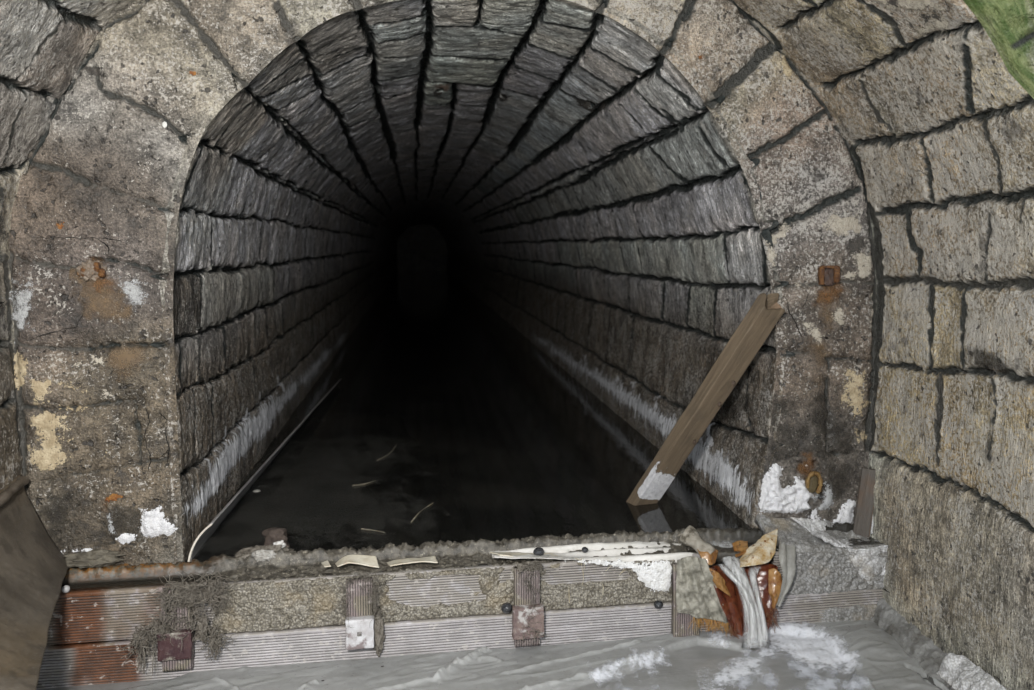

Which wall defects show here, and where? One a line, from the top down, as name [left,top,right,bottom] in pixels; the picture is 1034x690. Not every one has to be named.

corrosion [109,348,143,369]
efflorescence [529,331,677,438]
damp [45,493,70,537]
damp [102,333,346,545]
damp [685,361,888,584]